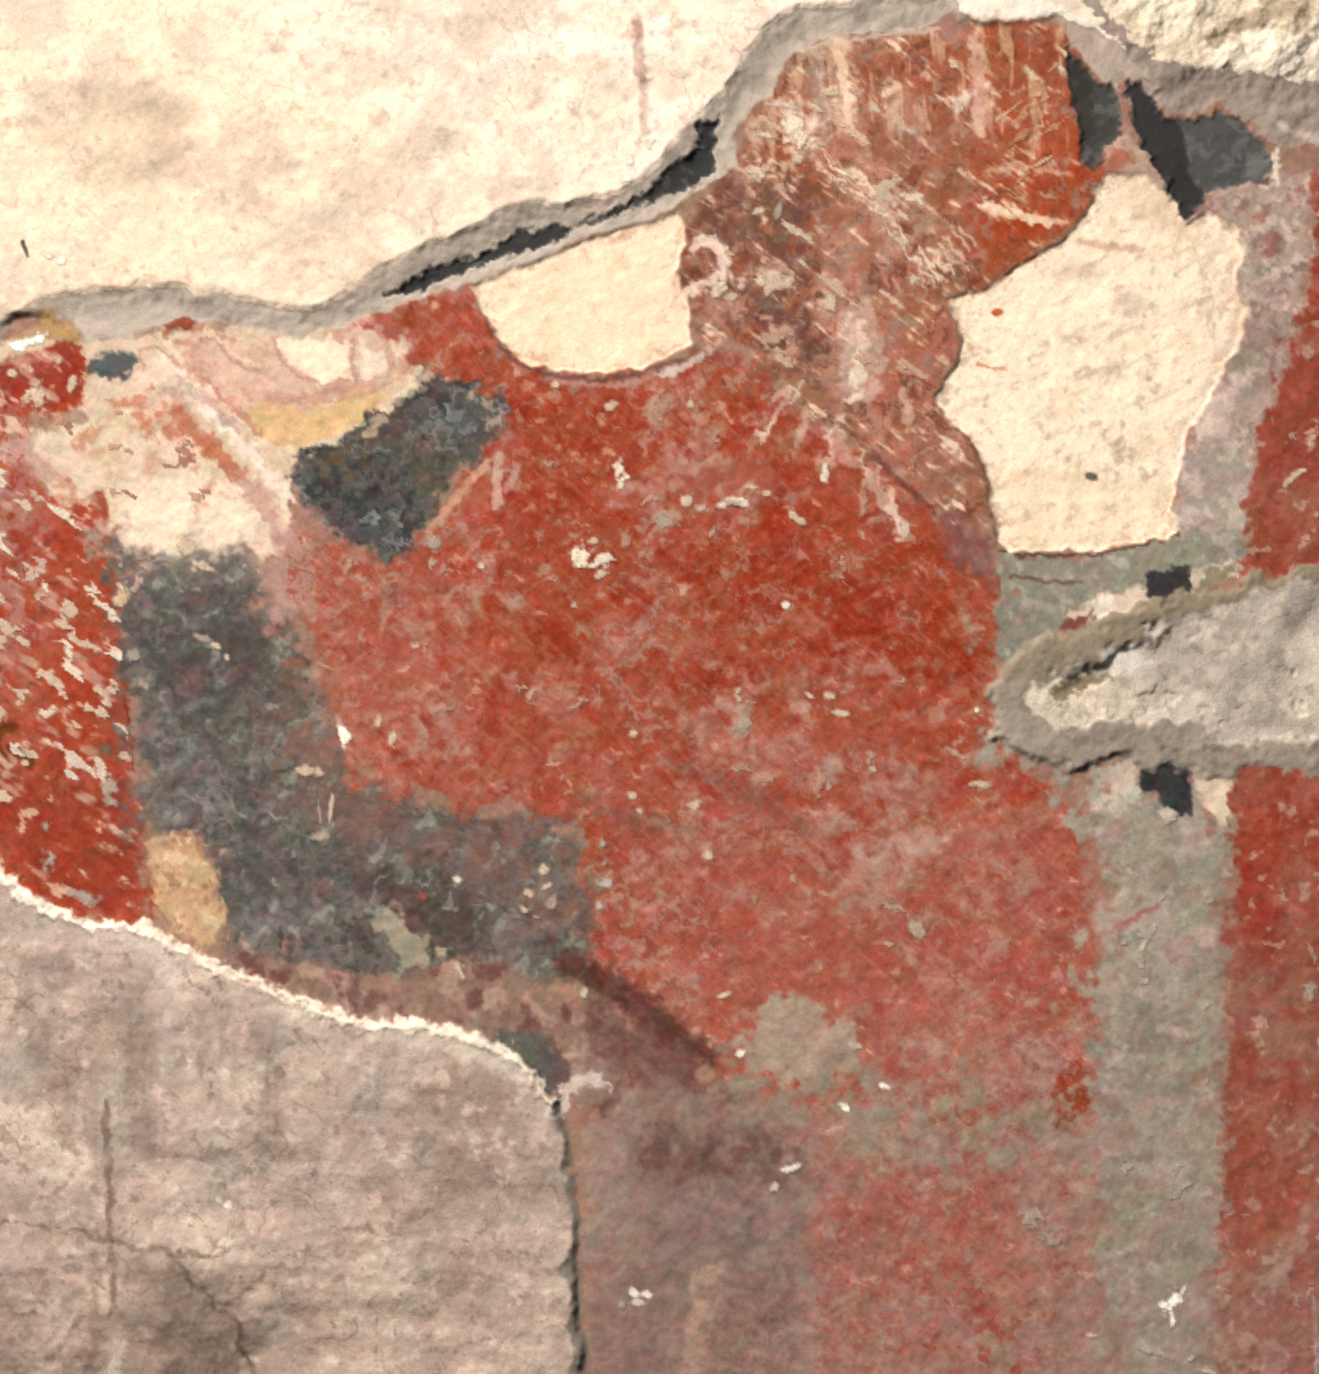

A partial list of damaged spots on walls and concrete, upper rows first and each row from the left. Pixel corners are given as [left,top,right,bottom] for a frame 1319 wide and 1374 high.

peeling [747,159,813,244]
flaking render [471,213,705,387]
flaking render [898,174,1247,554]
peeling [14,491,81,530]
peeling [613,462,630,489]
peeling [681,484,771,511]
peeling [0,533,49,600]
peeling [571,533,631,579]
peeling [0,583,140,807]
peeling [338,725,351,747]
spalling [0,864,562,1115]
crack [553,1102,588,1373]